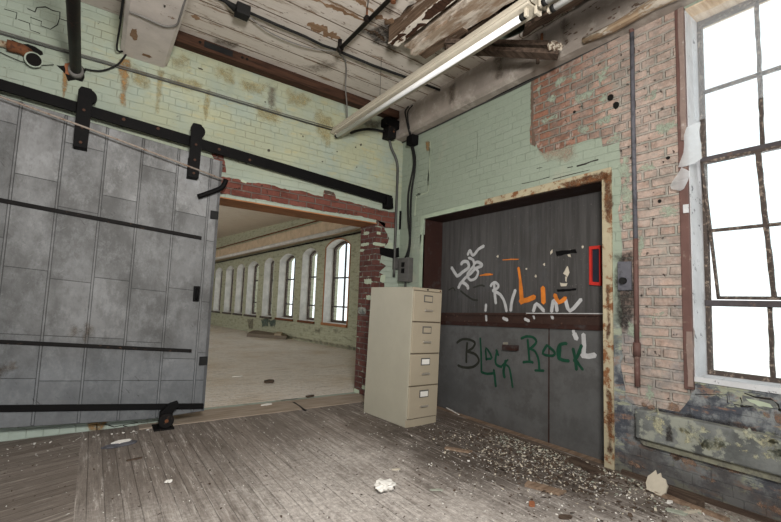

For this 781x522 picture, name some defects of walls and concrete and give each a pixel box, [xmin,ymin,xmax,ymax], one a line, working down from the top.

peeling [307,22,341,39]
peeling [313,0,454,45]
rust [562,172,613,222]
flaking render [530,11,692,433]
flaking render [211,153,395,396]
spalling [742,395,781,425]
peeling [678,424,781,461]
peeling [426,428,707,522]